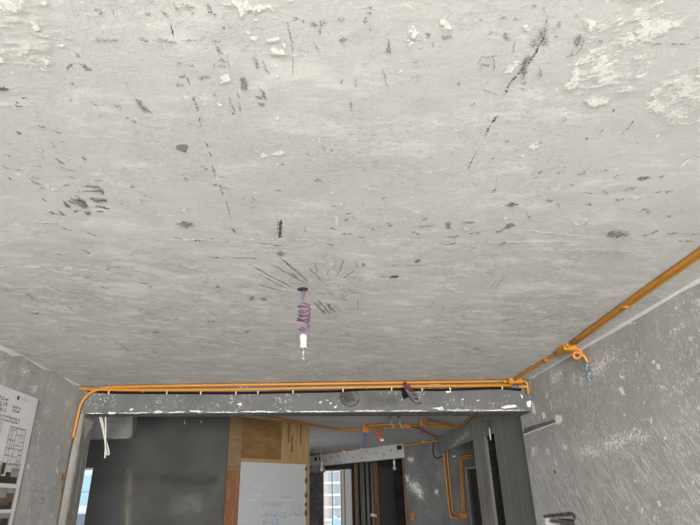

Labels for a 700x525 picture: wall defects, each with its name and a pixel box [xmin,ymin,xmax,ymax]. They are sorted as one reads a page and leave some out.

peeling [222,0,276,21]
peeling [247,31,286,56]
crack [502,17,548,98]
peeling [563,0,686,108]
peeling [645,65,700,125]
crack [435,116,498,173]